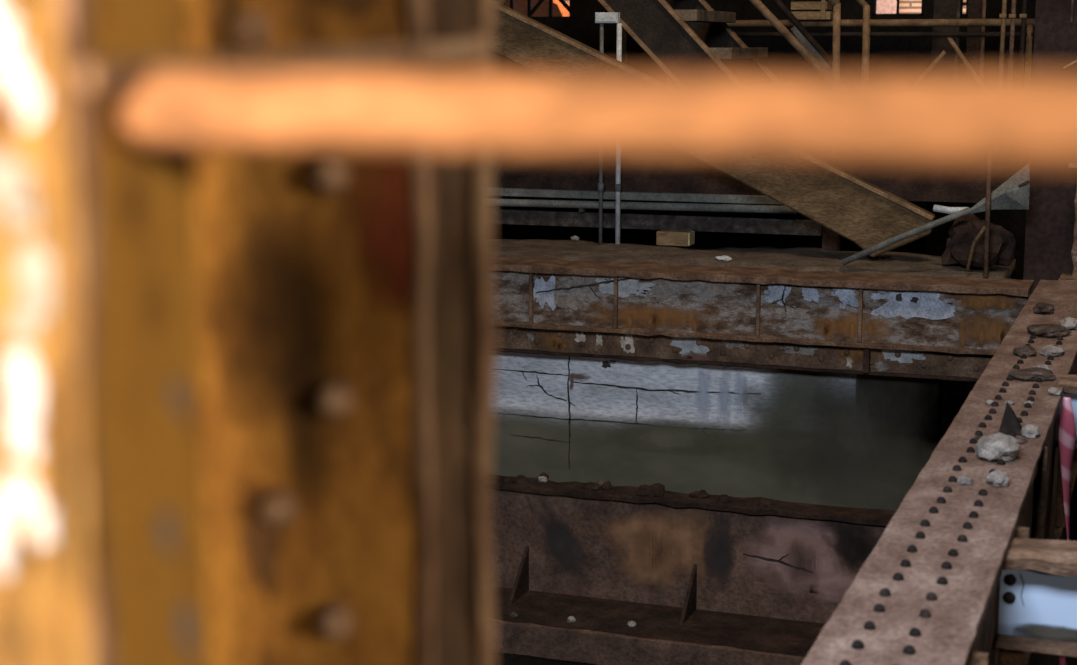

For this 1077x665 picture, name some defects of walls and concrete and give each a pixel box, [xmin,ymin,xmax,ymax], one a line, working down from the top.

peeling [501,271,741,311]
peeling [764,284,961,320]
peeling [575,332,603,346]
peeling [602,334,635,369]
peeling [669,337,710,356]
peeling [780,343,819,355]
crack [497,356,761,469]
rust [749,521,854,600]